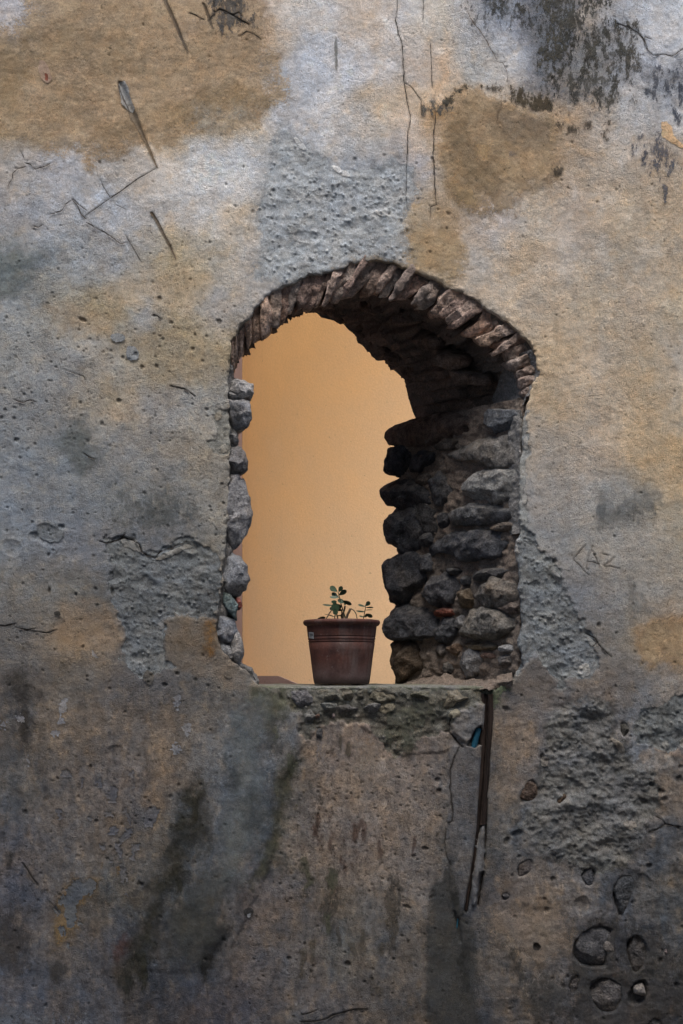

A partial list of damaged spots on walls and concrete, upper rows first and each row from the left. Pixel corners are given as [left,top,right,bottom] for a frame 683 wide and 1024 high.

leakage [208,0,258,38]
leakage [465,0,683,141]
crack [617,23,683,57]
crack [395,4,437,216]
leakage [631,131,683,203]
crack [34,199,127,244]
crack [100,534,187,558]
spalling [103,536,222,679]
spalling [518,695,683,915]
leakage [300,856,366,955]
peeling [488,893,611,970]
flaking render [590,978,622,1011]